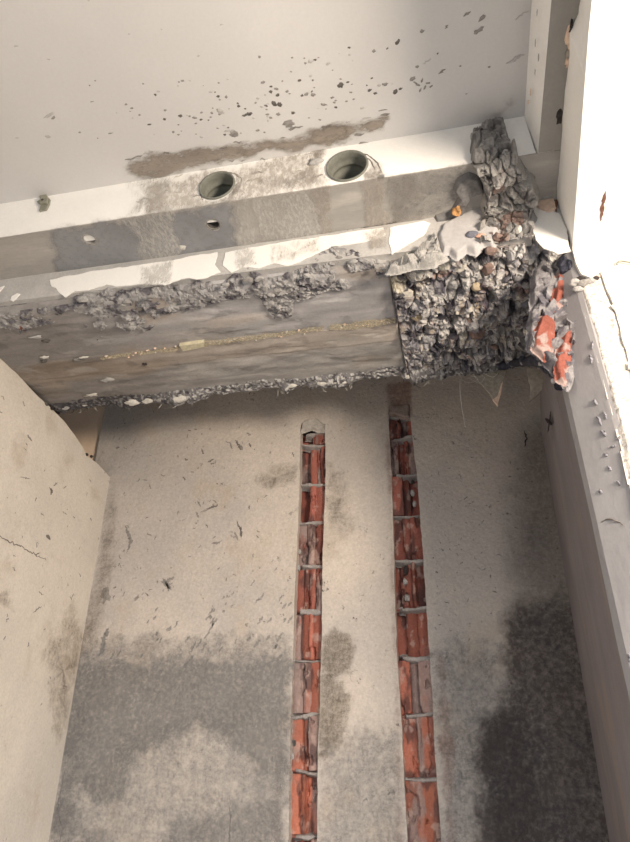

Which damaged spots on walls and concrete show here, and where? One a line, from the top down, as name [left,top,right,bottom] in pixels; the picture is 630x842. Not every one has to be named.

leakage [53,109,390,286]
spalling [0,117,630,486]
crack [0,536,46,560]
spalling [98,628,121,660]
leakage [51,636,294,842]
spalling [178,596,233,668]
leakage [318,632,351,756]
leakage [440,601,609,842]